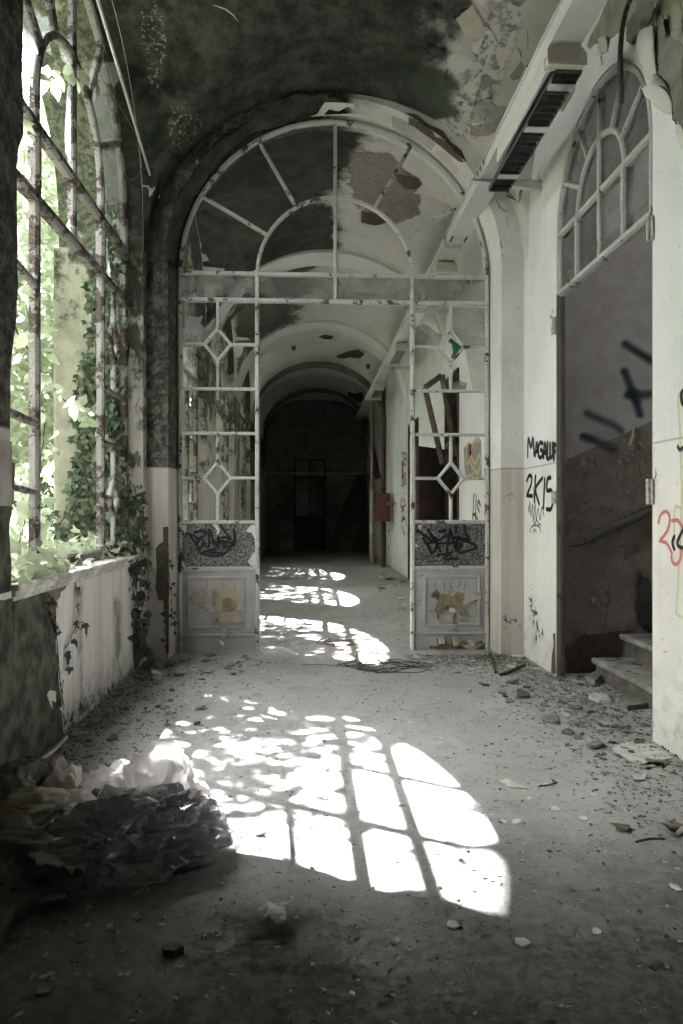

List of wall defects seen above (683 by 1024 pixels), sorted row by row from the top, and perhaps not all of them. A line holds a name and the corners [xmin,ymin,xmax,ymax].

peeling [451,6,485,61]
peeling [510,61,530,81]
peeling [587,0,683,149]
peeling [311,102,466,174]
peeling [471,98,507,137]
leakage [112,0,470,373]
peeling [346,151,422,226]
flaking render [336,350,370,369]
peeling [189,582,243,646]
peeling [428,581,482,623]